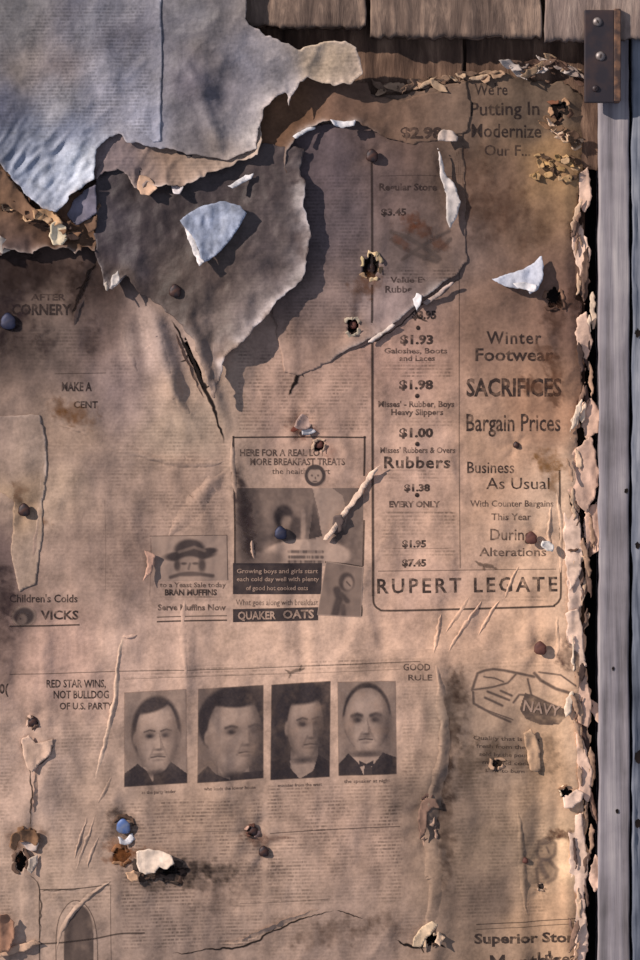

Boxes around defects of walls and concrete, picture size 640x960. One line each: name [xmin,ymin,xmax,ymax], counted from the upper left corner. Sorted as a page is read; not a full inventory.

peeling [547,97,570,125]
peeling [344,317,361,338]
crack [360,303,426,348]
crack [174,324,223,437]
water stain [144,859,214,887]
crack [179,909,360,954]